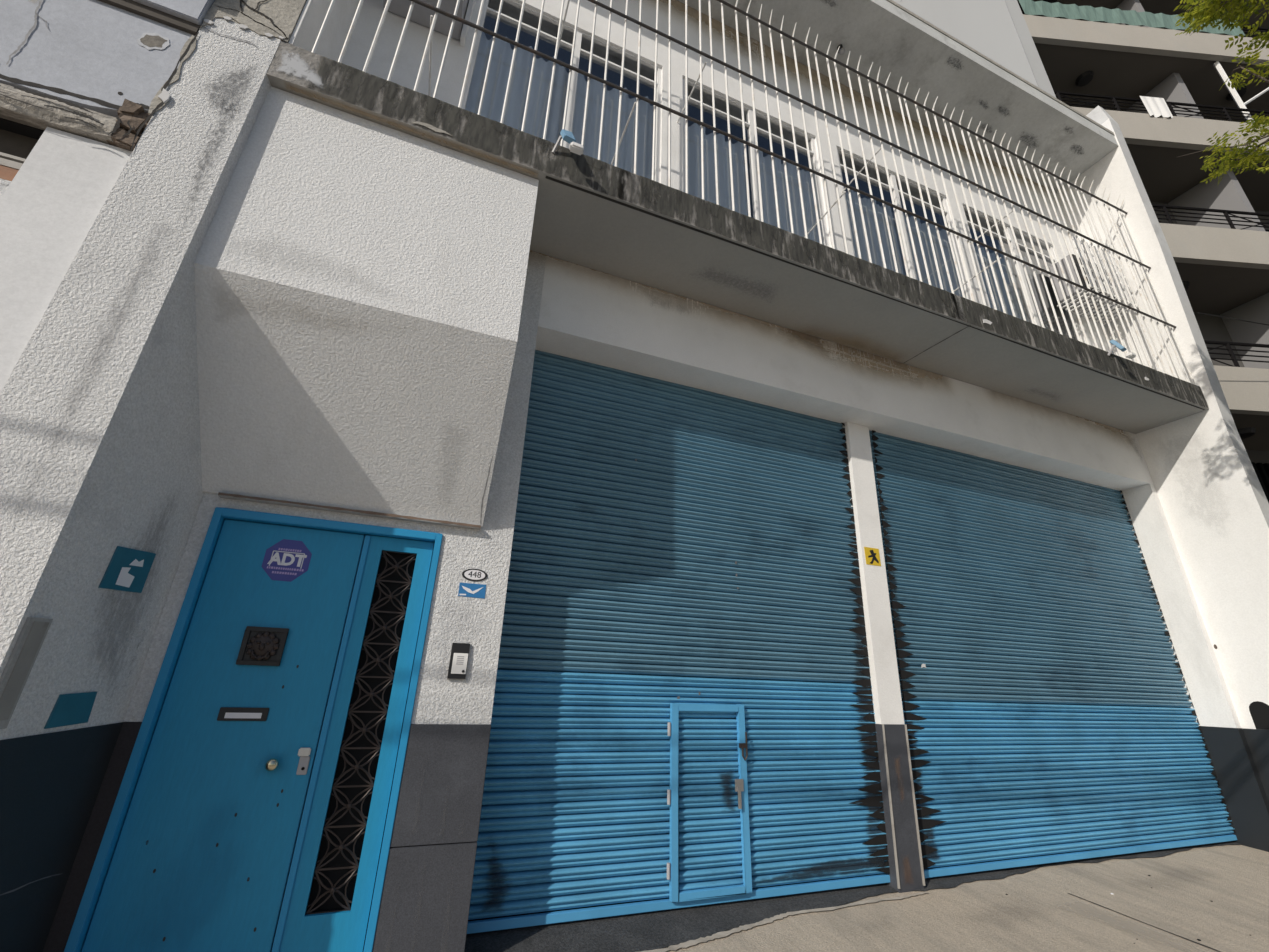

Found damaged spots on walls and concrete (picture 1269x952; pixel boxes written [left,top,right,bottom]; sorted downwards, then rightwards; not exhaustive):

crack [0,0,104,128]
spalling [0,2,291,152]
crack [203,0,288,47]
leakage [662,0,1042,186]
leakage [306,57,1208,408]